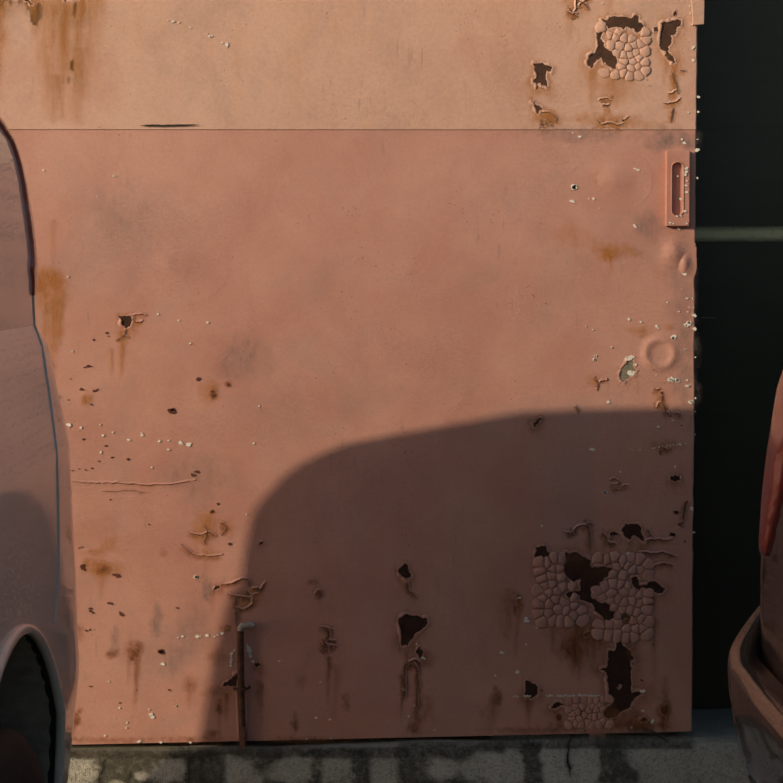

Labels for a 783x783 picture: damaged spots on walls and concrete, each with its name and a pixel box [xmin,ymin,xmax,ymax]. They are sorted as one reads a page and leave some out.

peeling [528,59,555,117]
peeling [616,355,640,385]
peeling [396,560,414,583]
peeling [396,611,431,660]
peeling [524,520,668,730]
peeling [515,670,541,703]
crack [565,735,573,775]